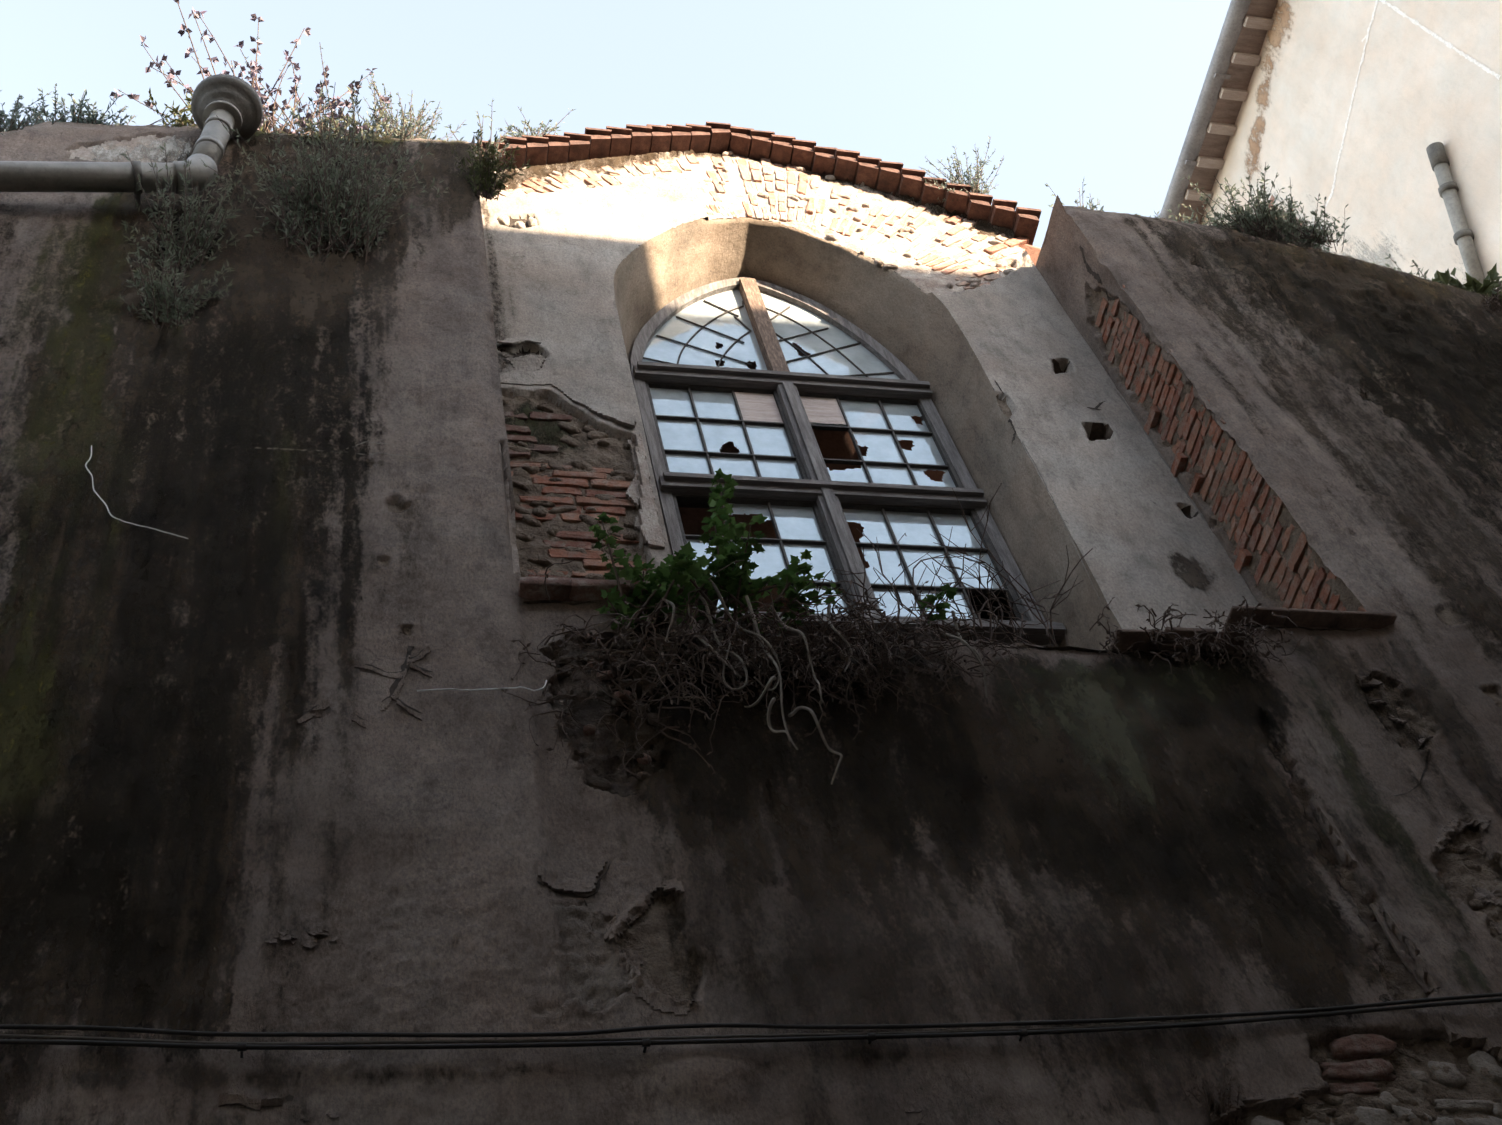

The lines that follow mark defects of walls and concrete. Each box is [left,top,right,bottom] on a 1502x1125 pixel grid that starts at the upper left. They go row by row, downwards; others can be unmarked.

flaking render [495,151,1029,295]
leakage [1163,228,1502,530]
flaking render [497,335,665,582]
spalling [1177,505,1198,519]
leakage [0,132,513,1078]
spalling [1355,671,1439,751]
flaking render [536,843,608,894]
flaking render [603,878,702,1016]
leakage [607,612,1383,1110]
spalling [1259,720,1440,1010]
spalling [1432,811,1502,943]
spalling [1220,1015,1502,1125]